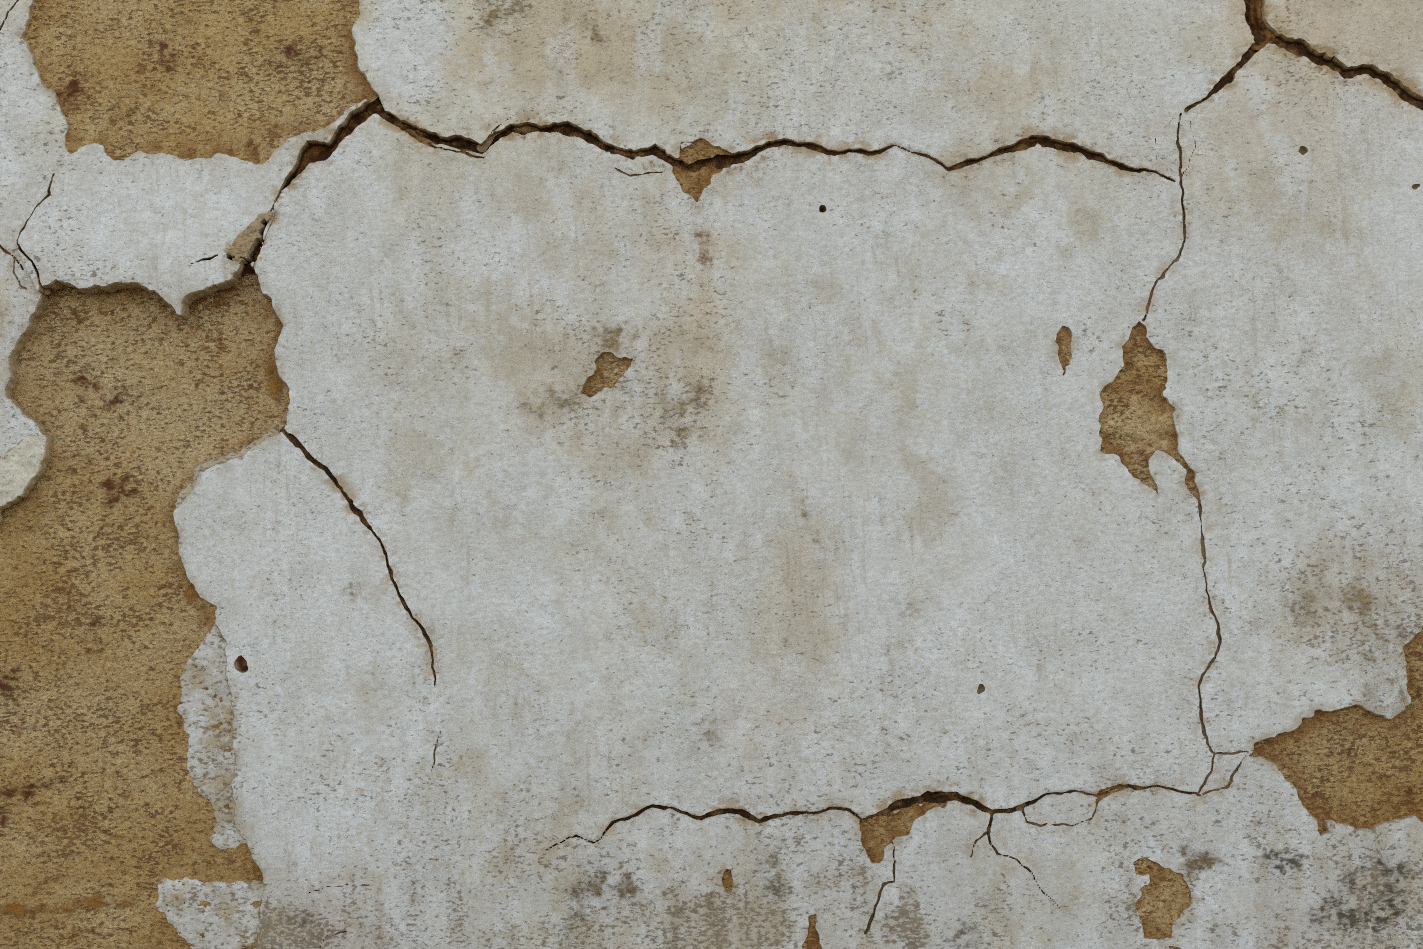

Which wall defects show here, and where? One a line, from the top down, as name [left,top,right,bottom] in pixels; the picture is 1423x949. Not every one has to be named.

crack [0,174,55,295]
peeling [24,0,378,164]
crack [209,224,267,273]
crack [289,0,1423,325]
peeling [1099,317,1200,504]
peeling [0,273,290,949]
crack [280,426,436,685]
crack [550,487,1251,908]
peeling [1251,627,1423,833]
crack [864,850,895,934]
peeling [853,801,947,863]
peeling [1133,858,1191,949]